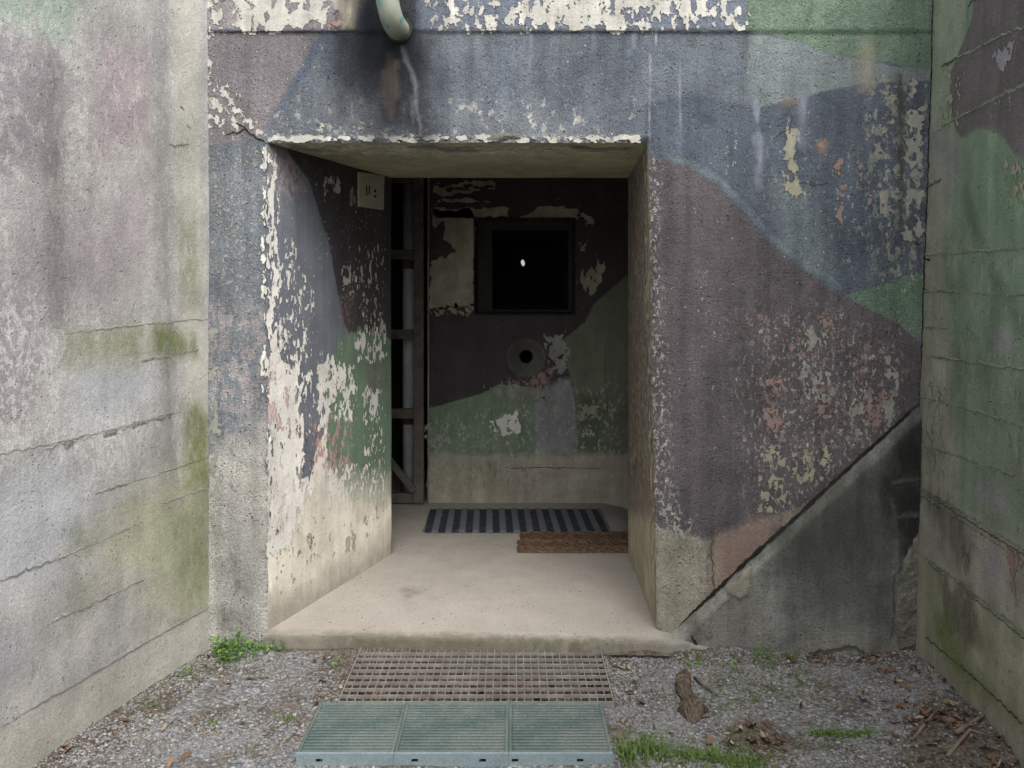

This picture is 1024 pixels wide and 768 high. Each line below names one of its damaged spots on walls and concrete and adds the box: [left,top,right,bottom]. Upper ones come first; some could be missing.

peeling [207,0,345,40]
peeling [420,0,751,35]
crack [227,123,265,143]
peeling [782,125,803,197]
peeling [834,65,965,243]
peeling [207,54,698,619]
peeling [757,311,900,513]